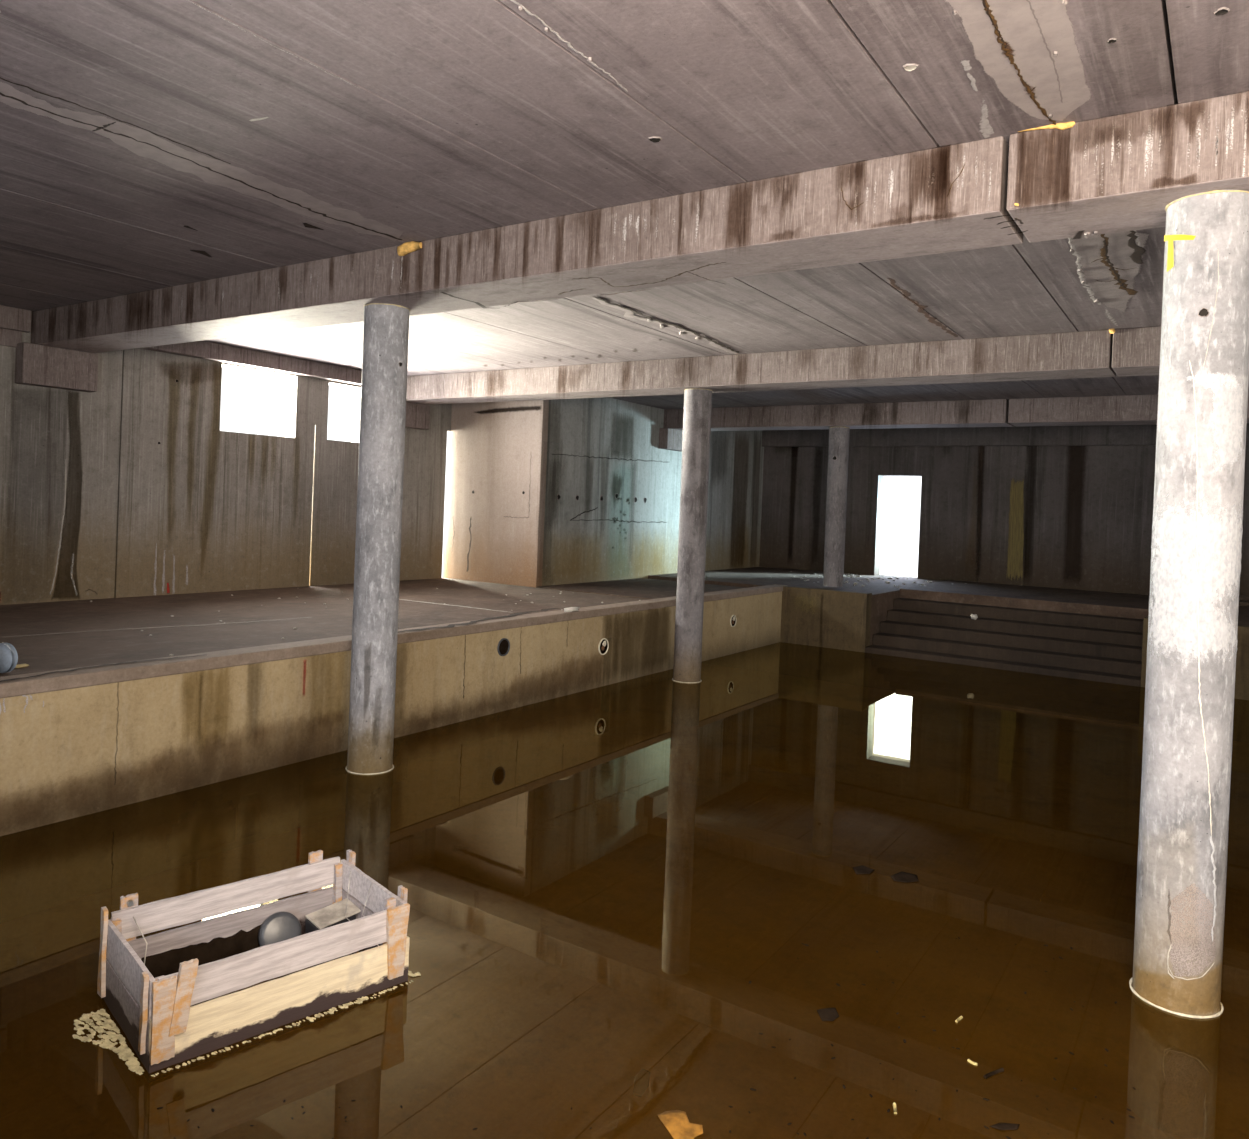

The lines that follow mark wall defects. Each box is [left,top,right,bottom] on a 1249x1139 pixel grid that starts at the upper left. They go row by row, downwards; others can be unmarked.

water stain [961,60,994,138]
flaking render [945,0,1092,122]
crack [0,92,402,240]
water stain [612,214,658,259]
water stain [848,170,894,232]
water stain [1084,125,1162,193]
water stain [1187,106,1249,177]
flaking render [1068,231,1150,326]
water stain [53,393,82,598]
water stain [153,544,189,596]
crack [1189,248,1219,941]